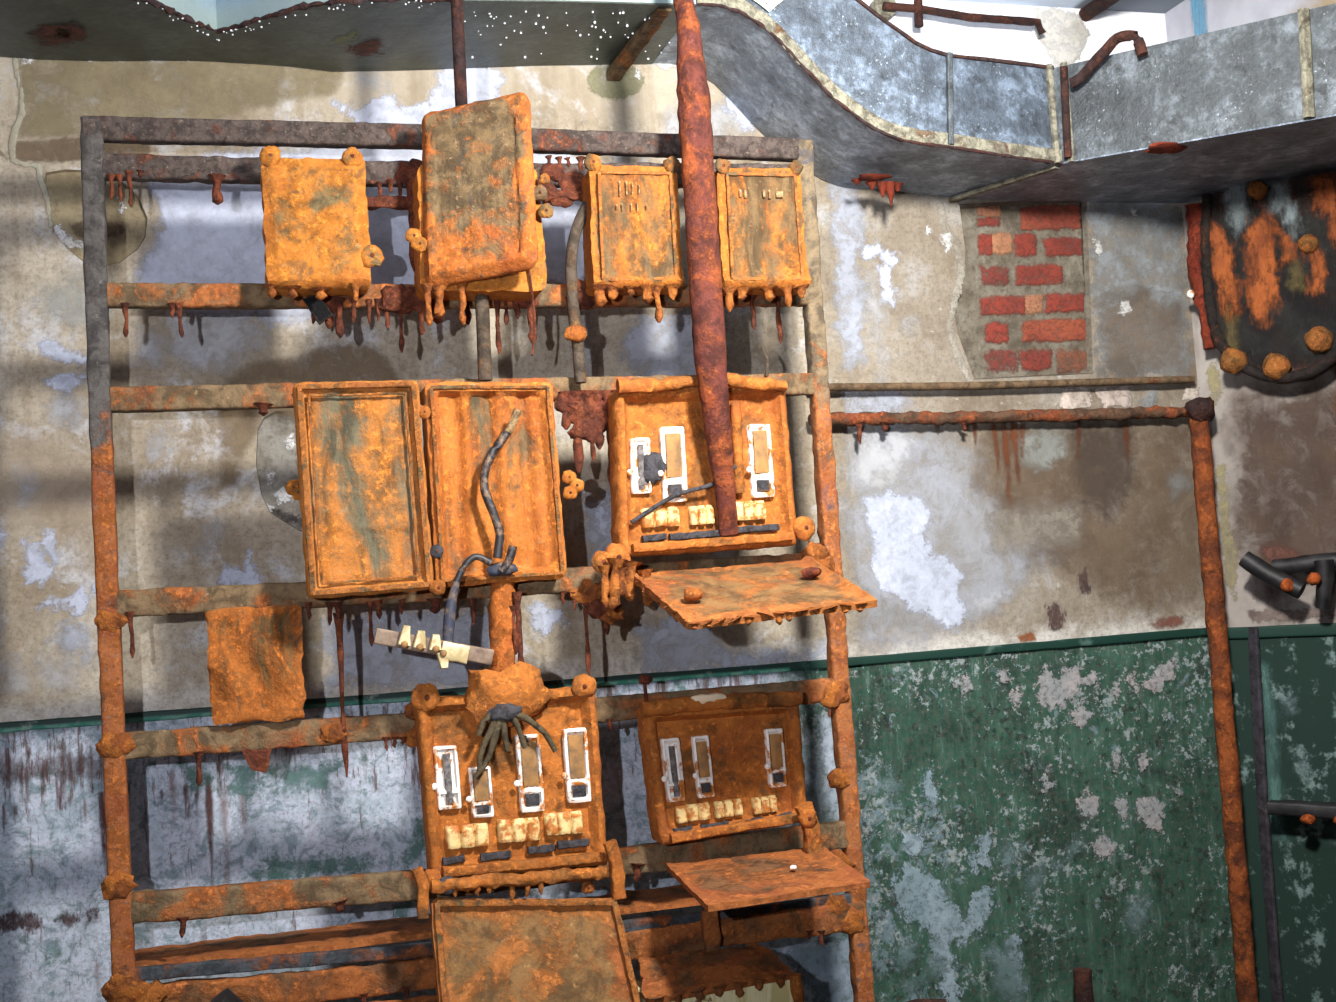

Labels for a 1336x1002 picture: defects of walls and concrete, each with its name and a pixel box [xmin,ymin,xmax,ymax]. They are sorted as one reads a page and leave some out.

corrosion [133,0,450,34]
peeling [1034,7,1091,68]
peeling [829,183,900,372]
flaking render [926,201,1222,409]
flaking render [256,411,302,531]
peeling [841,390,1064,642]
corrosion [959,422,1024,492]
water stain [978,424,1201,631]
peeling [996,657,1178,729]
corrosion [59,732,137,853]
corrosion [184,751,224,873]
peeling [890,821,1014,1002]